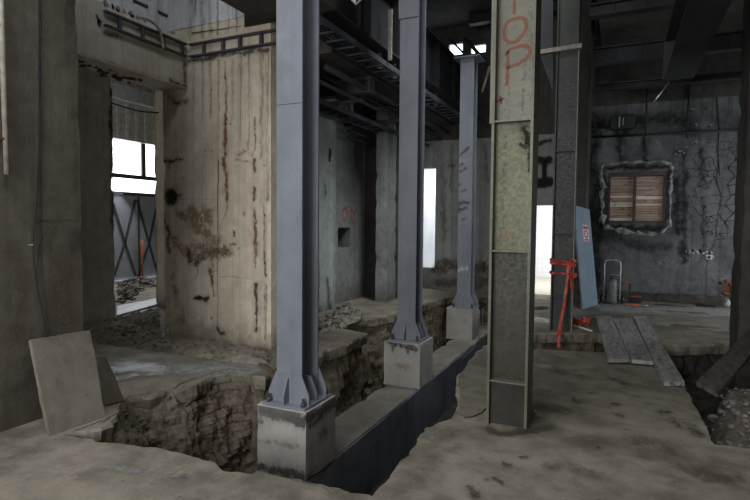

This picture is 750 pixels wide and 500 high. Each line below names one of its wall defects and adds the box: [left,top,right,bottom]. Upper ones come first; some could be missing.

spalling [598,150,685,237]
crack [684,147,737,255]